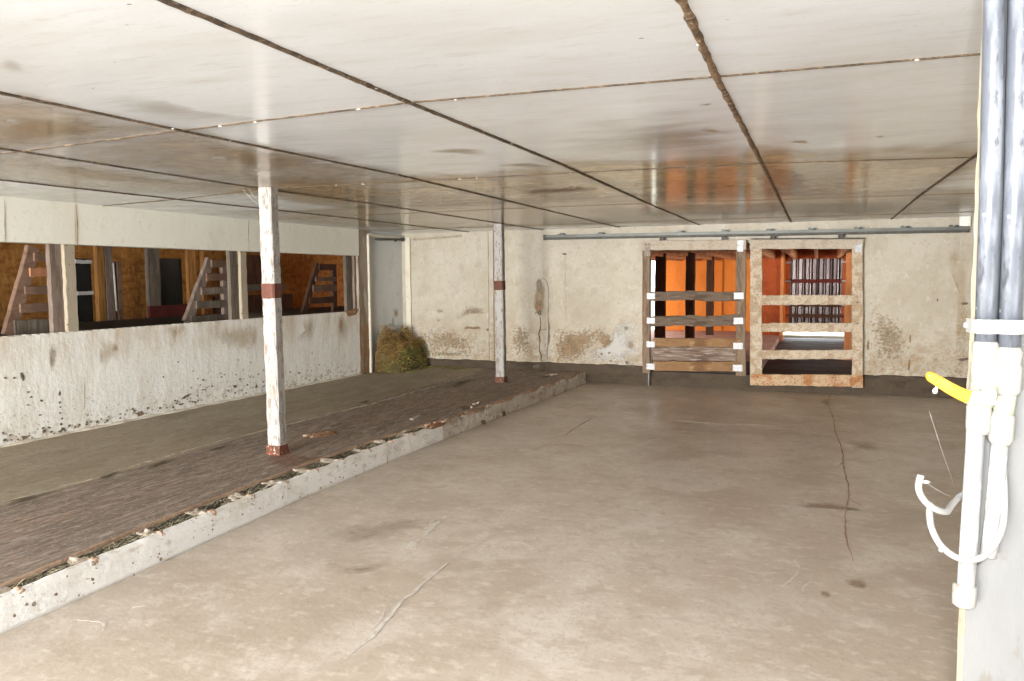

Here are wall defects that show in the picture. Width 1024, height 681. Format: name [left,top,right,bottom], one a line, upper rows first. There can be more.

crack [827,394,862,560]